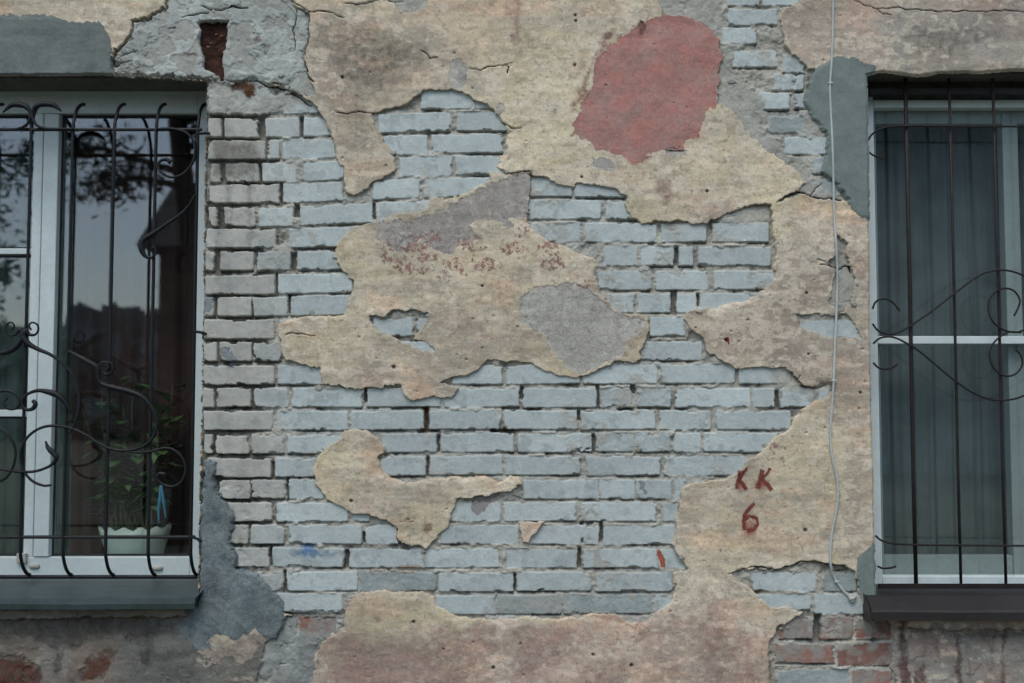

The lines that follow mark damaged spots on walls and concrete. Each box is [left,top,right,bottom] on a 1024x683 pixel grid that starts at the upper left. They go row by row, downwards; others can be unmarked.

crack [183,5,248,18]
crack [226,0,394,107]
crack [857,2,1024,15]
spalling [113,0,846,683]
spalling [796,236,864,341]
spalling [700,562,896,683]